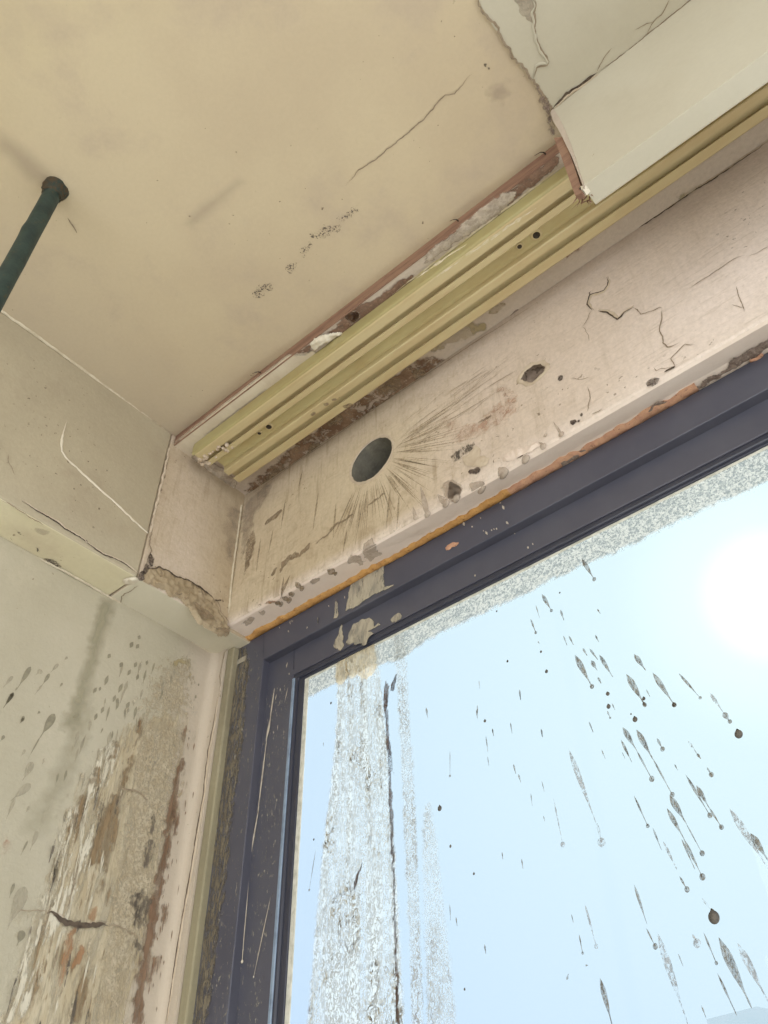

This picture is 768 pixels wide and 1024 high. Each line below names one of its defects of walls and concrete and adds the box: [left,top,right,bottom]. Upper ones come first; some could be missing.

crack [478,0,690,135]
crack [351,78,467,180]
spalling [516,360,563,387]
crack [583,278,690,372]
crack [3,448,170,603]
flaking render [138,566,230,637]
crack [18,909,137,936]
rust [132,726,195,1024]